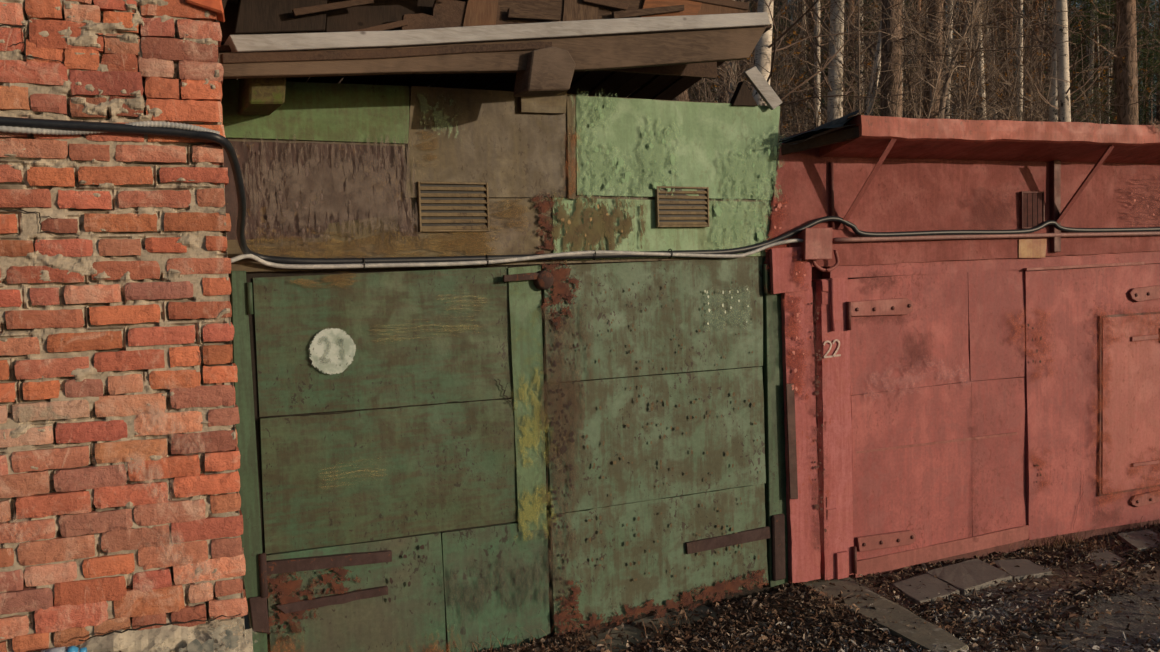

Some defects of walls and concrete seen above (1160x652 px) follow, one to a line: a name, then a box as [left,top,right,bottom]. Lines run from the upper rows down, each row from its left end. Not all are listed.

corrosion [552,568,768,636]